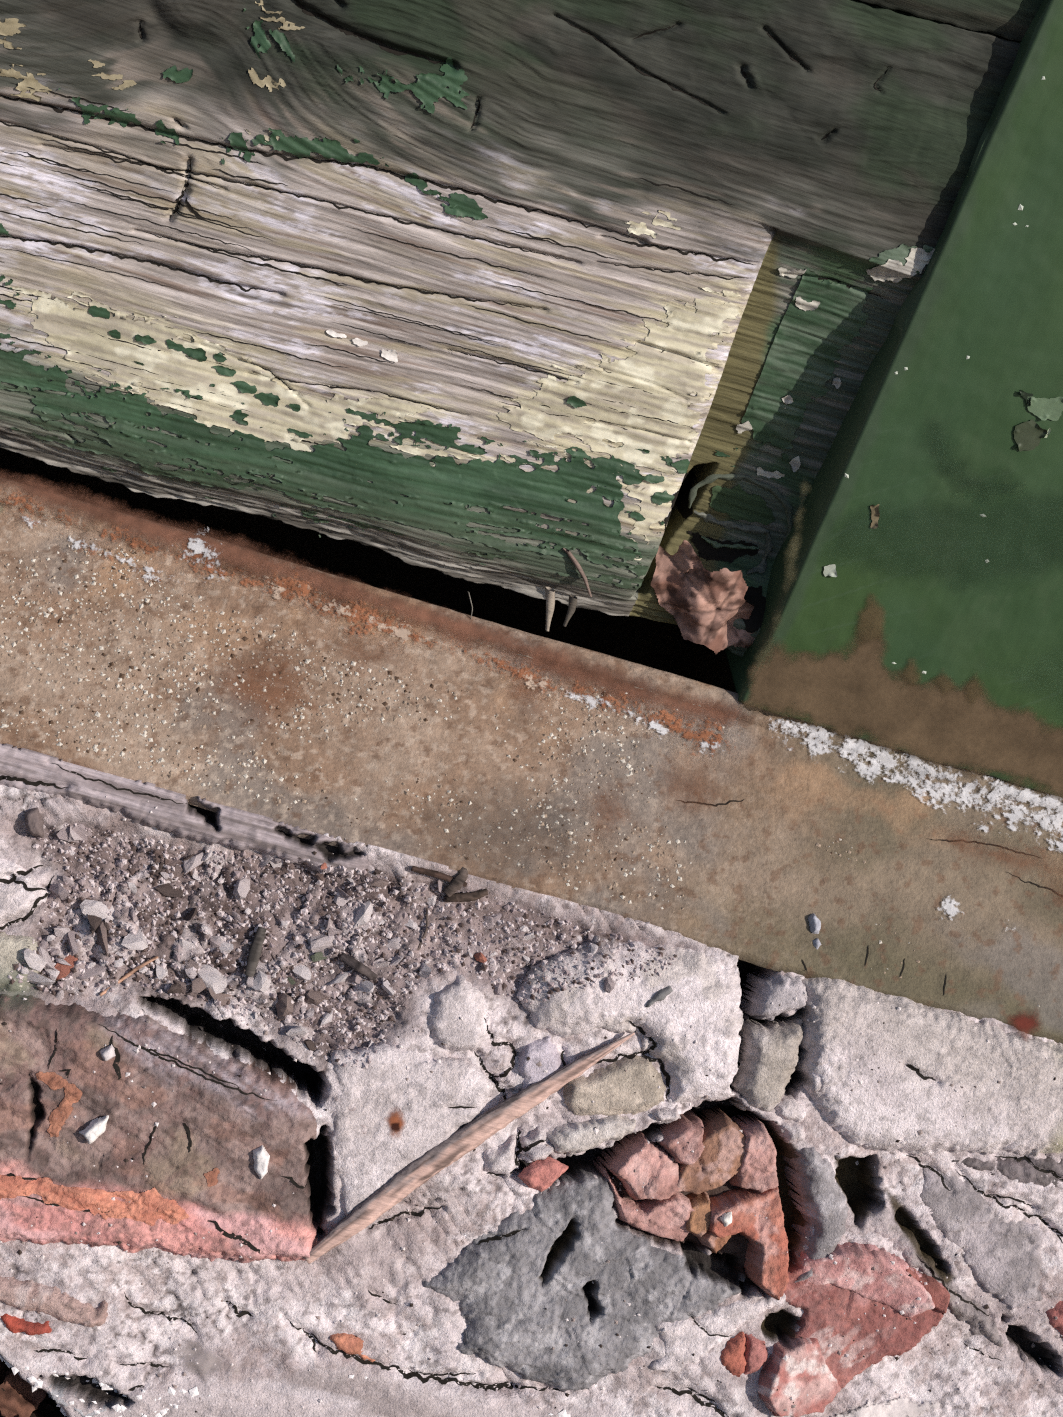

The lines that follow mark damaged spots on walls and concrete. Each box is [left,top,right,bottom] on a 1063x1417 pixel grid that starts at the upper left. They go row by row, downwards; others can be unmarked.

peeling [183,534,220,579]
peeling [823,564,837,577]
corrosion [0,476,739,757]
peeling [565,692,669,735]
peeling [769,719,1063,851]
peeling [937,896,964,920]
spalling [35,1072,109,1144]
spalling [253,1145,270,1179]
spalling [0,1175,189,1226]
crack [907,1155,1063,1243]
crack [125,1294,199,1336]
crack [224,1301,560,1391]